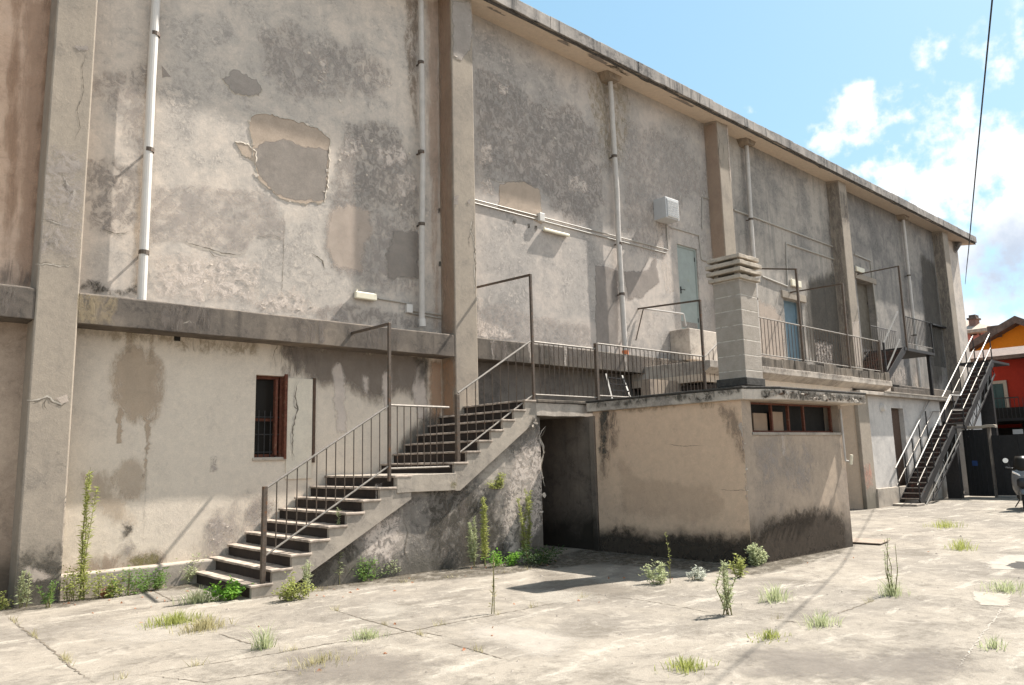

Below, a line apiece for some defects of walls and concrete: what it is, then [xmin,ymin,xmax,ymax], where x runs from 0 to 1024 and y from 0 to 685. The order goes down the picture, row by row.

flaking render [220,69,263,98]
flaking render [235,112,332,206]
leakage [258,291,428,432]
crack [28,395,64,411]
leakage [114,334,162,477]
crack [290,382,299,461]
leakage [599,508,846,566]